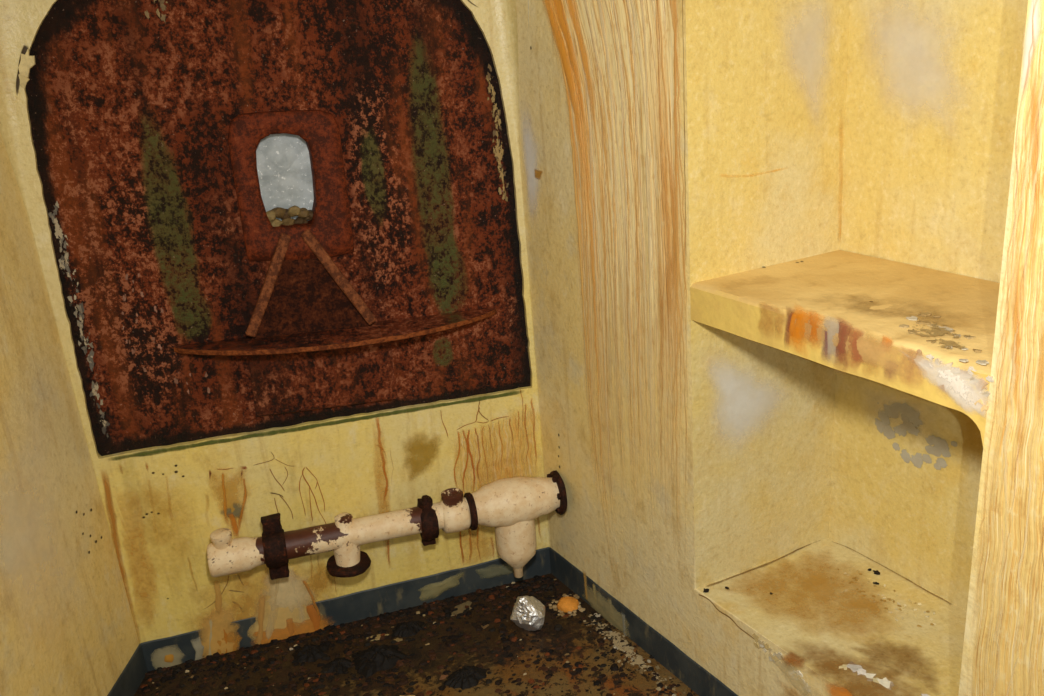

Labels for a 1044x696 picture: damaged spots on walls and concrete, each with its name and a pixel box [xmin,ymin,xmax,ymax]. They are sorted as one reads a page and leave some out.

corrosion [777,310,915,378]
spalling [899,312,994,413]
leakage [407,438,437,474]
crack [441,402,509,436]
corrosion [454,390,536,494]
spalling [752,633,818,696]
peeling [839,661,894,690]